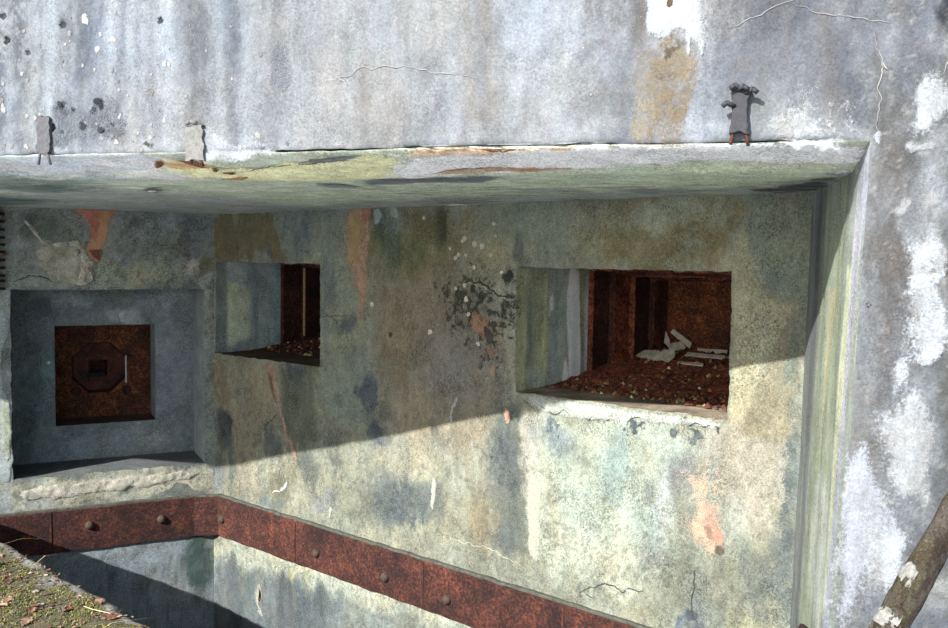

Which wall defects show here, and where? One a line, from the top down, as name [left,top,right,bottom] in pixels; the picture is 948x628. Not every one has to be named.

crack [727,0,893,131]
damp [906,73,948,152]
rust [154,158,248,180]
damp [895,198,913,219]
spalling [35,240,95,286]
rust [344,208,371,324]
peeling [454,283,495,377]
rust [681,472,724,556]